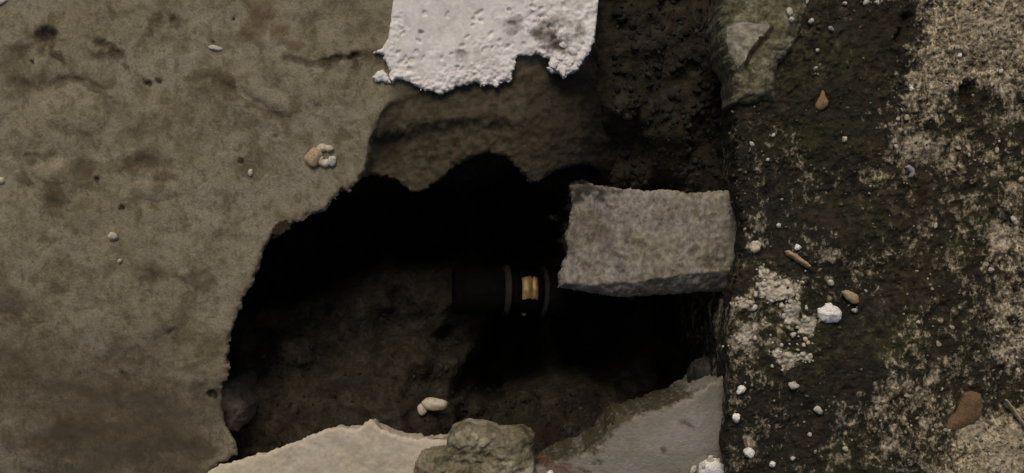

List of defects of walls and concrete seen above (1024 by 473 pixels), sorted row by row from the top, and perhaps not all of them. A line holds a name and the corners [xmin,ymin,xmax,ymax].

peeling [372,70,391,84]
spalling [264,203,331,249]
efflorescence [722,263,822,372]